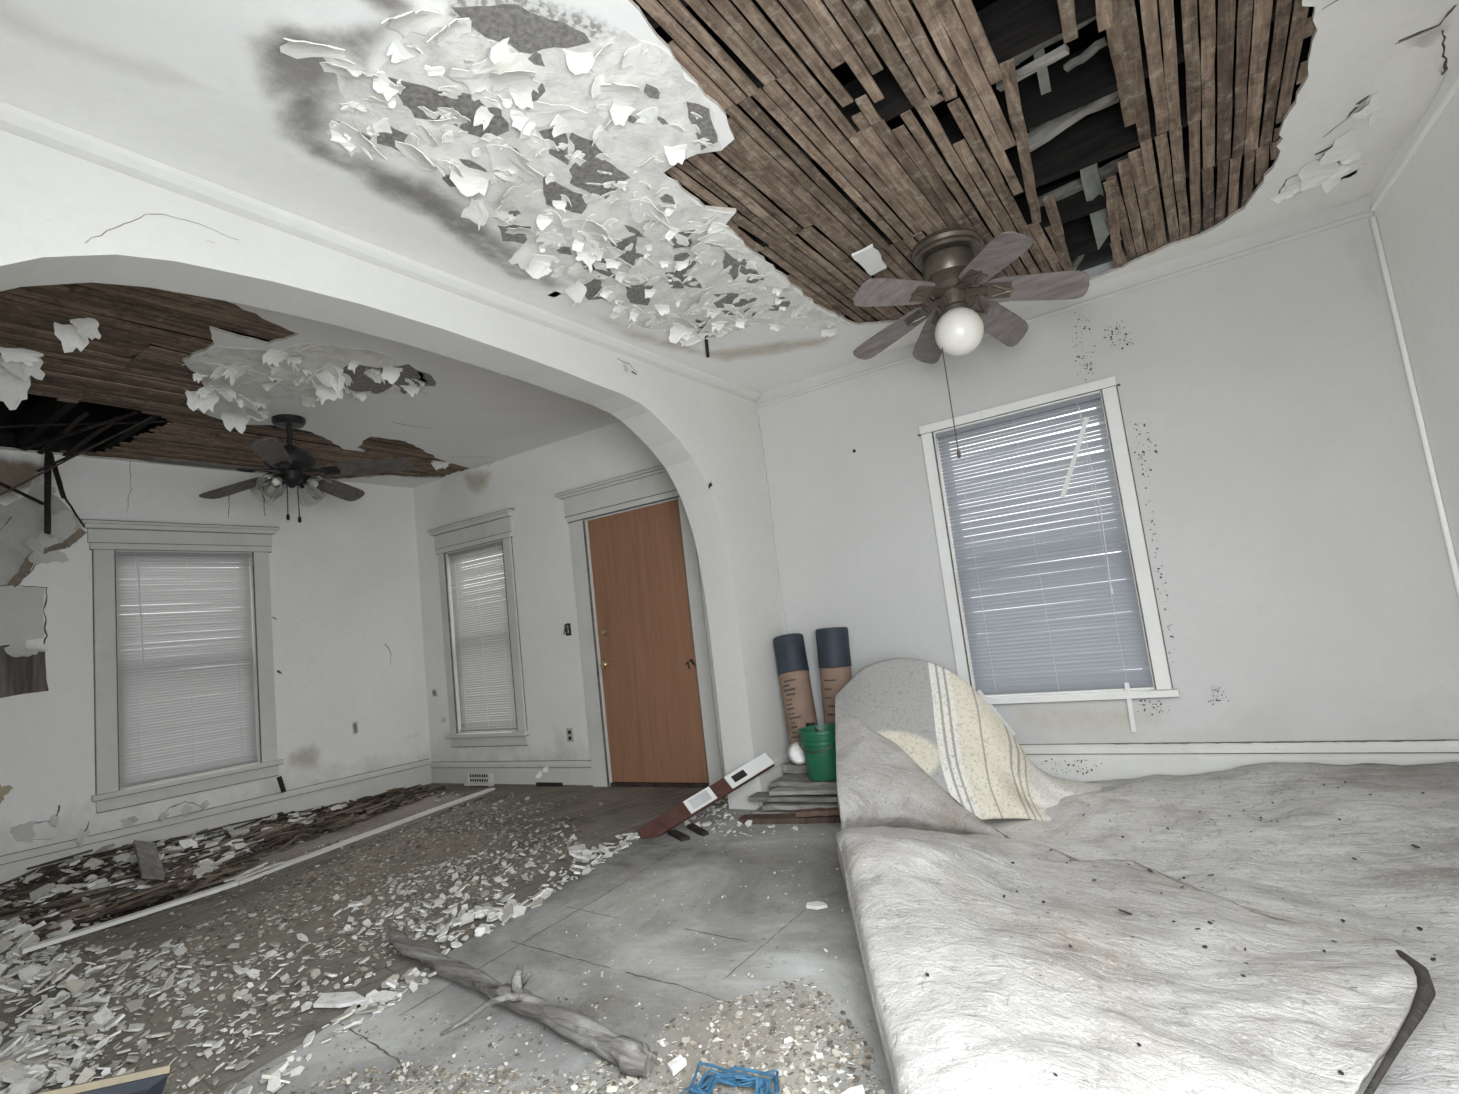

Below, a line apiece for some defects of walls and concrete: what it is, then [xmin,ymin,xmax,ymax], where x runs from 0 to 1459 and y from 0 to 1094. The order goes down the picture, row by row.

crack [85,214,238,244]
leakage [0,0,852,367]
flaking render [280,0,1316,358]
leakage [1072,311,1133,380]
flaking render [0,282,470,698]
leakage [1131,423,1174,654]
peeling [0,785,13,804]
peeling [10,805,62,843]